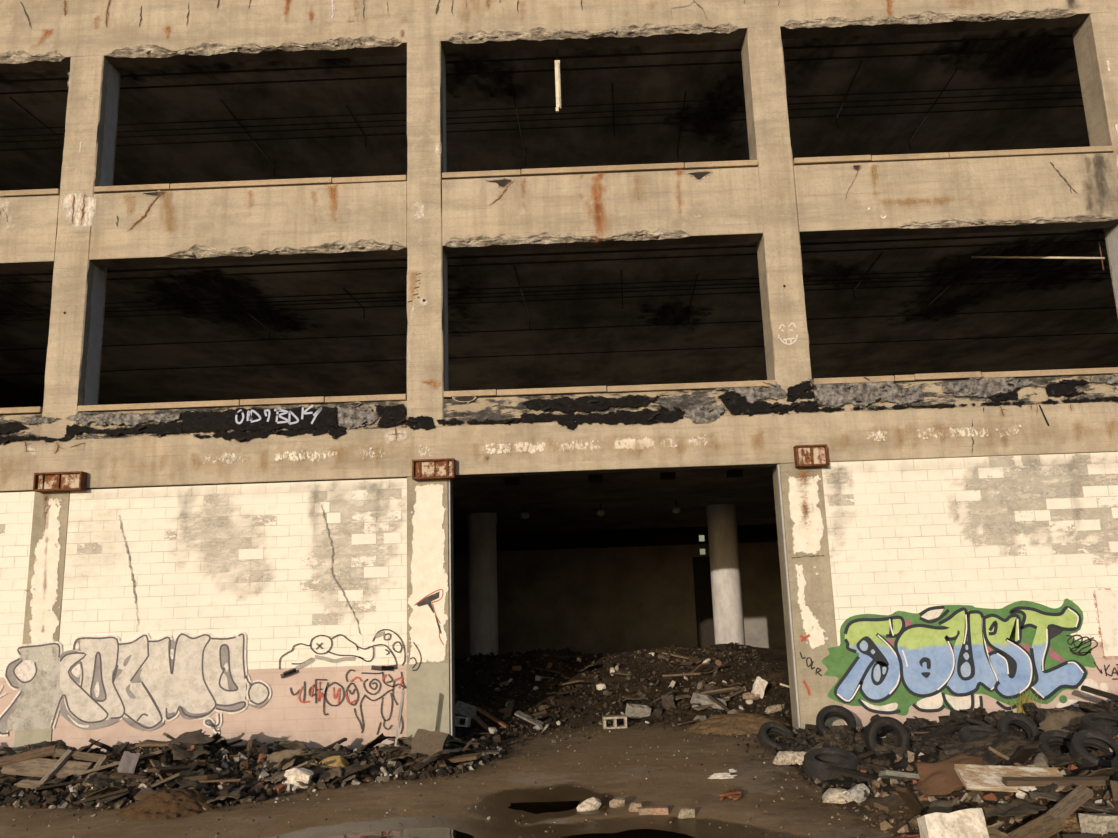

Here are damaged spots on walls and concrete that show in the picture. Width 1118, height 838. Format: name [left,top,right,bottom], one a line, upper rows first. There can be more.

spalling [442,22,737,173]
leakage [136,269,318,335]
peeling [0,266,1118,465]
spalling [444,228,688,403]
spalling [898,214,1118,309]
crack [118,515,138,631]
crack [321,504,360,633]
peeling [301,483,449,664]
peeling [788,468,854,649]